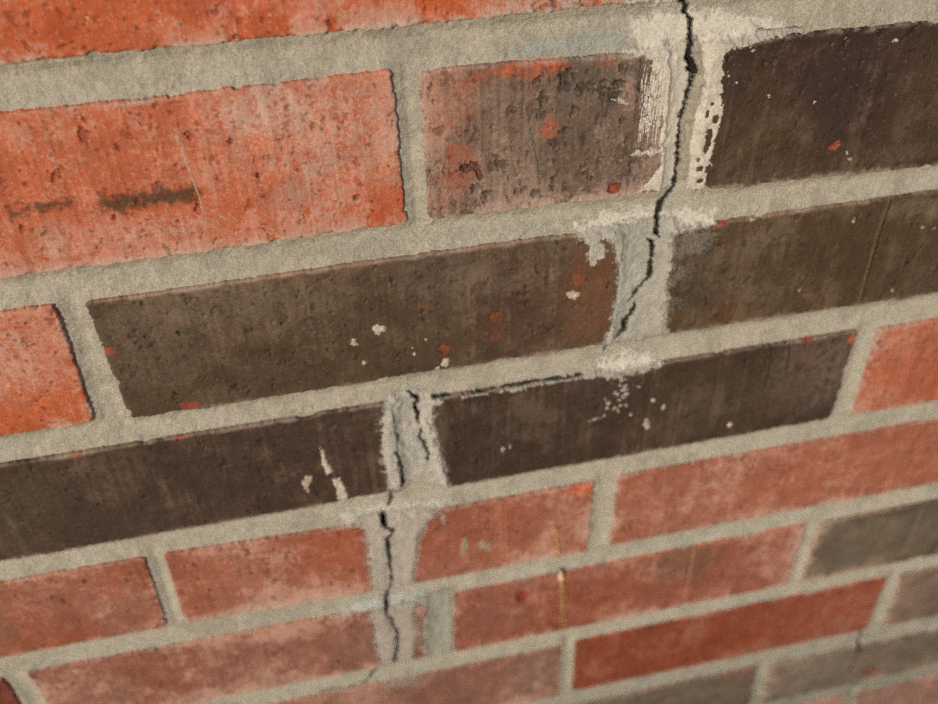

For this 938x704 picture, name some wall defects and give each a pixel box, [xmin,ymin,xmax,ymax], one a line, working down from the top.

crack [603,0,699,351]
crack [321,372,583,691]